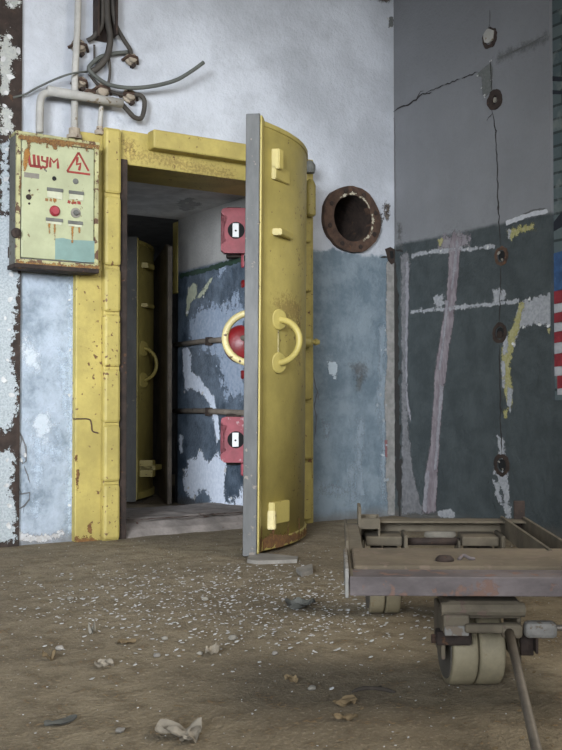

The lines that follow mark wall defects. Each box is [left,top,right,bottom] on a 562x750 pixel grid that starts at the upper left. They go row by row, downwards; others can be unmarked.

peeling [0,27,22,95]
corrosion [18,134,100,195]
crack [487,112,500,236]
peeling [0,104,20,434]
peeling [186,266,227,317]
peeling [178,347,243,506]
corrosion [260,523,307,552]
crack [393,72,476,516]
flaking render [376,244,503,515]
peeling [438,508,455,518]
peeling [410,287,551,418]
peeling [492,435,512,518]